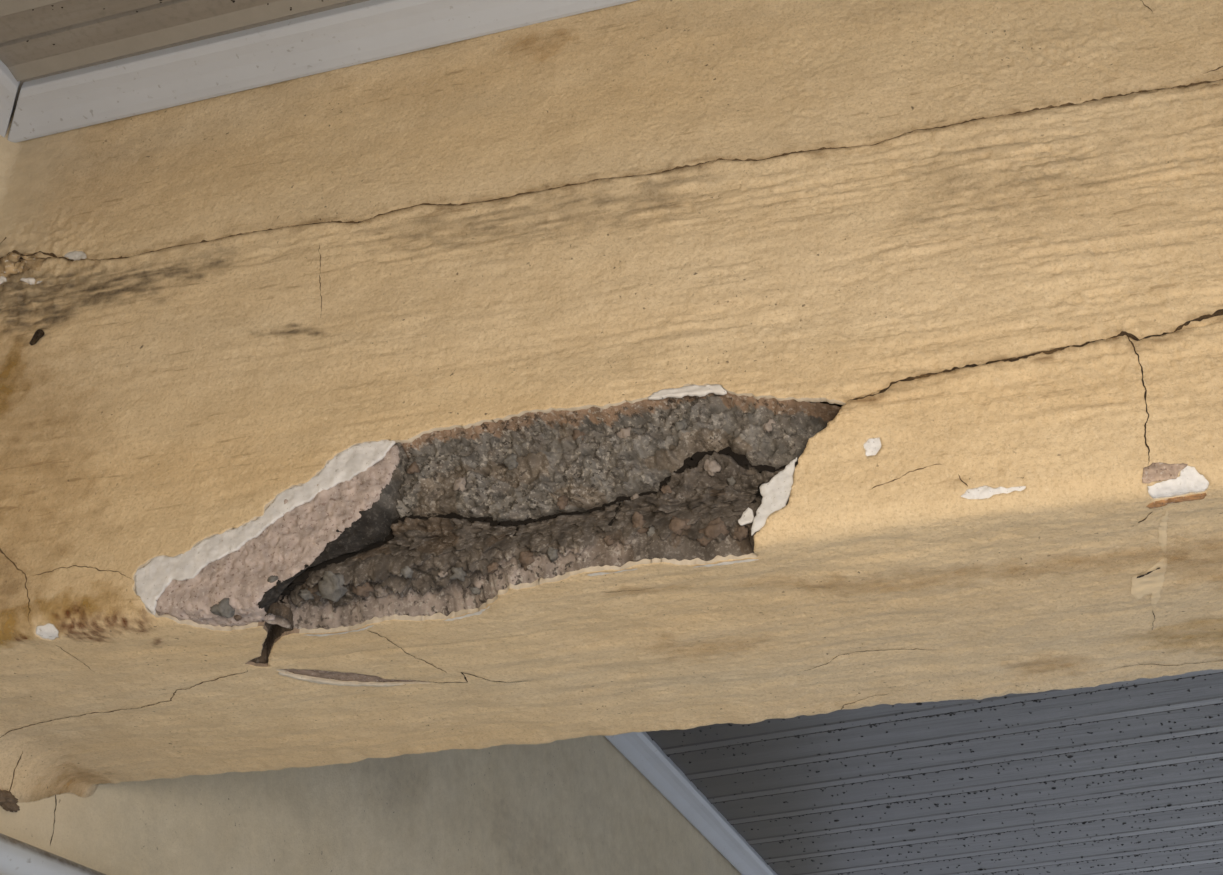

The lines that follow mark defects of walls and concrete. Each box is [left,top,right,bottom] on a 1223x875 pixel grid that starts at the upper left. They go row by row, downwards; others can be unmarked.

crack [56,66,1223,317]
spalling [0,237,87,285]
damp [7,269,201,325]
spalling [29,329,45,346]
crack [843,309,1223,463]
spalling [135,384,841,636]
crack [872,464,968,489]
peeling [1142,462,1209,509]
crack [0,549,131,621]
crack [0,602,522,792]